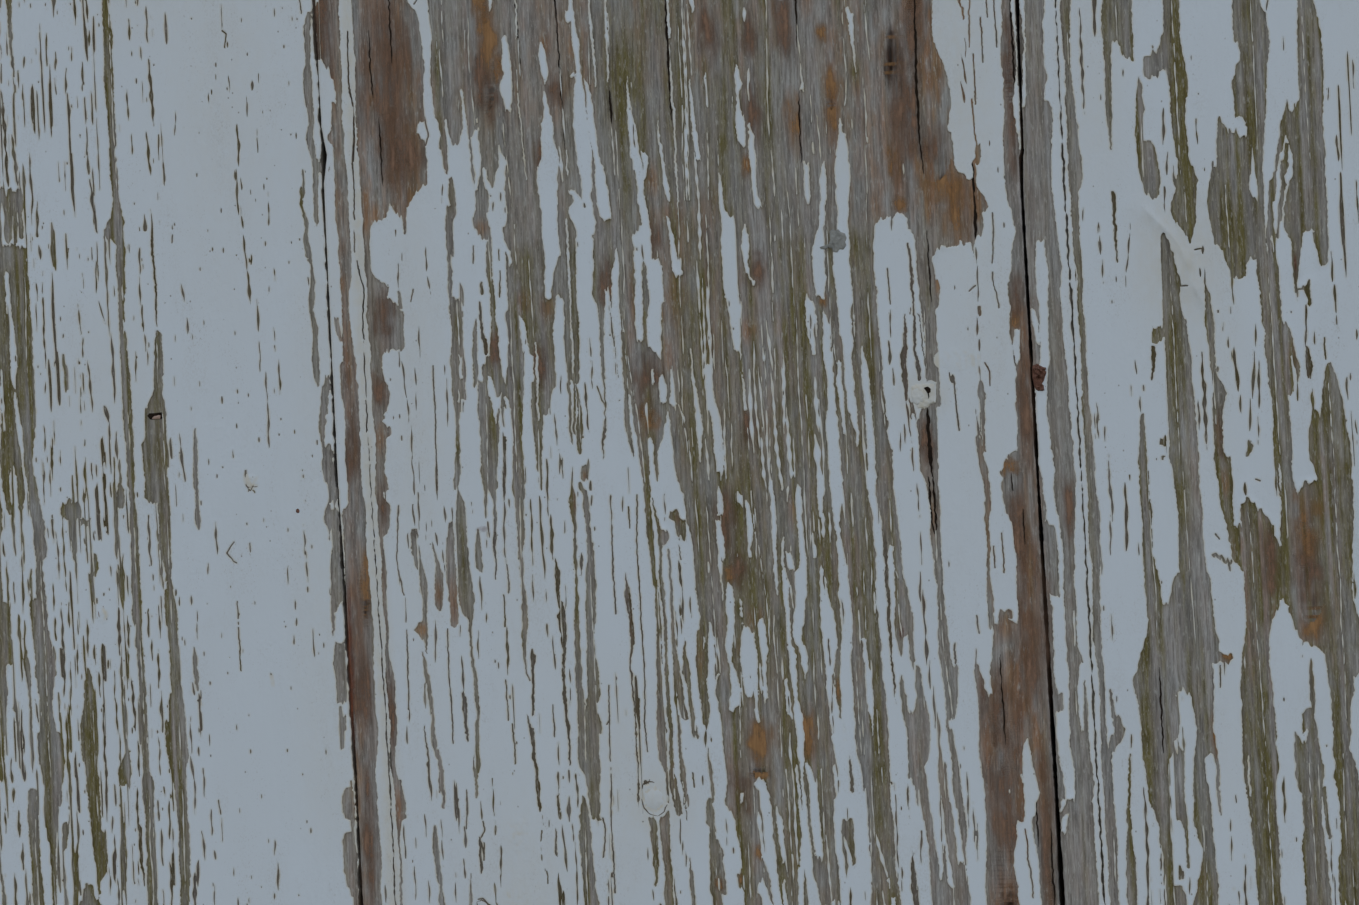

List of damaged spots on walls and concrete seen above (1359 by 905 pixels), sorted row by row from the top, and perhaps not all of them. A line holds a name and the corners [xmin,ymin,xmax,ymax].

peeling [0,0,199,905]
peeling [193,429,201,530]
peeling [300,0,1359,905]